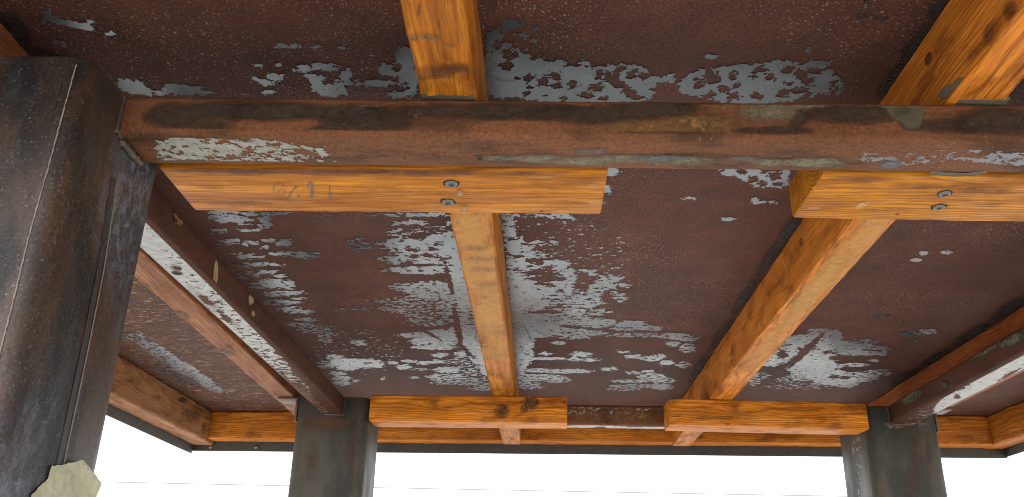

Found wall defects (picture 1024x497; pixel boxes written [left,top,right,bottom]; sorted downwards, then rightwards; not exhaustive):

peeling [252,46,419,107]
peeling [483,18,845,104]
peeling [154,138,336,162]
corrosion [143,102,894,134]
peeling [859,150,1024,166]
corrosion [916,107,1024,133]
peeling [140,223,327,412]
peeling [207,210,490,391]
peeling [500,213,700,391]
peeling [749,328,892,390]
peeling [885,355,1024,429]